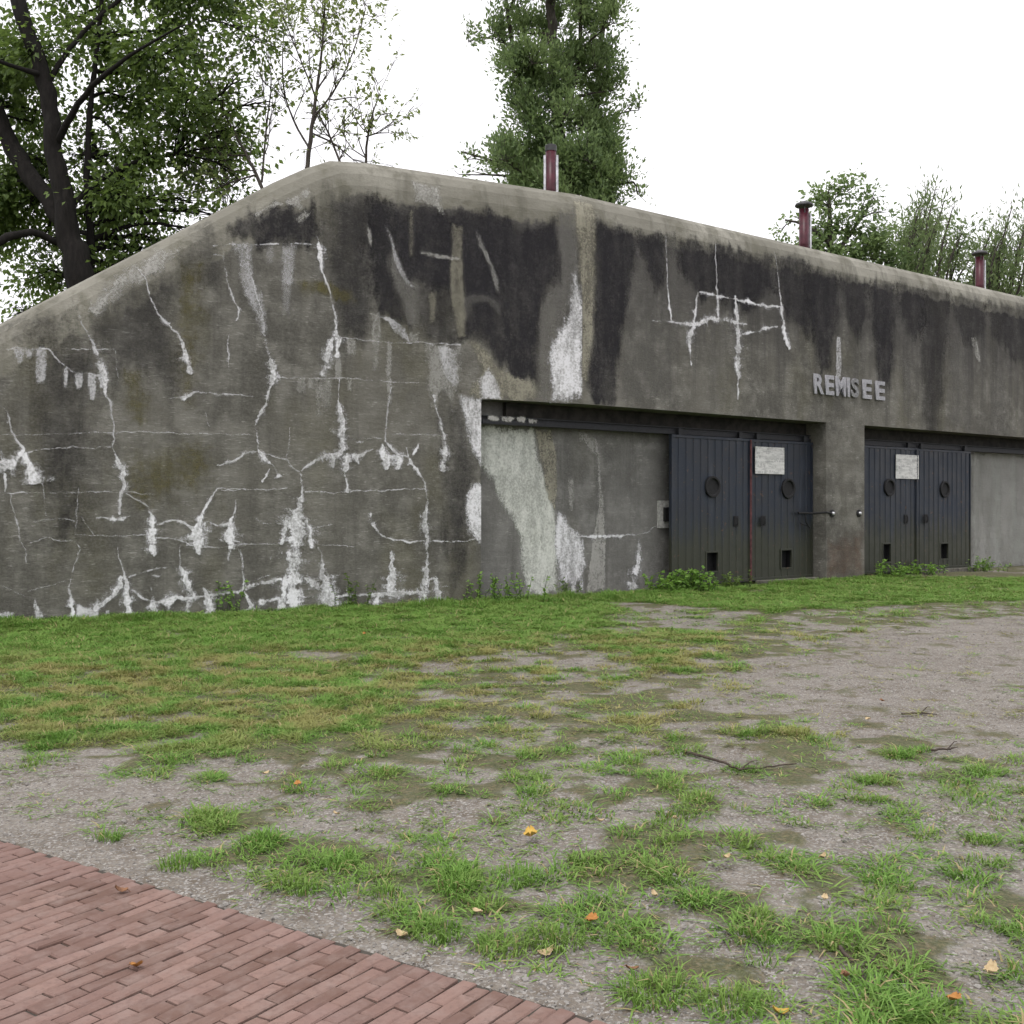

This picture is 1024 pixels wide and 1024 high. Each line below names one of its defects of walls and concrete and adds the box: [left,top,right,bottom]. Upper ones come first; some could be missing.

water stain [231,201,318,251]
crack [0,419,53,494]
crack [41,341,109,396]
efflorescence [64,370,103,400]
efflorescence [76,605,109,618]
crack [69,273,474,616]
crack [317,242,342,376]
water stain [368,196,664,462]
efflorescence [555,451,606,592]
crack [577,534,642,590]
crack [653,244,791,396]
water stain [679,240,926,383]